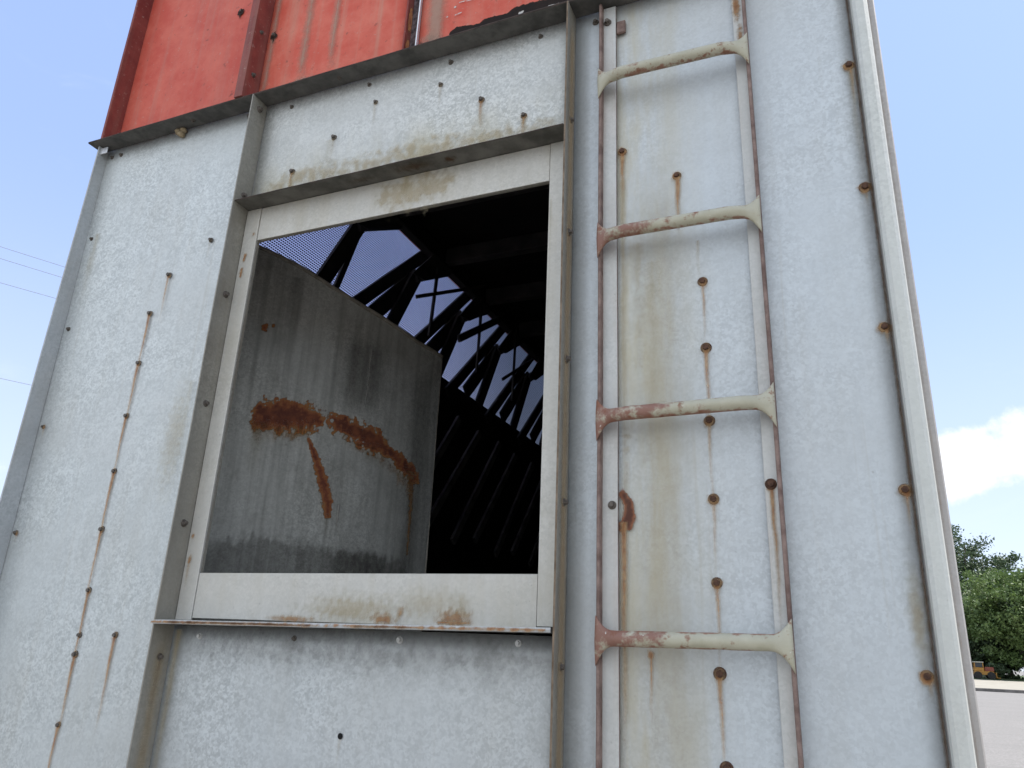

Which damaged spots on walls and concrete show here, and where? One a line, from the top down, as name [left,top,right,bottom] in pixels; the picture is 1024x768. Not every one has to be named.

rust [672,172,680,212]
rust [62,314,151,713]
rust [249,395,419,555]
rust [619,490,636,631]
rust [716,676,724,735]